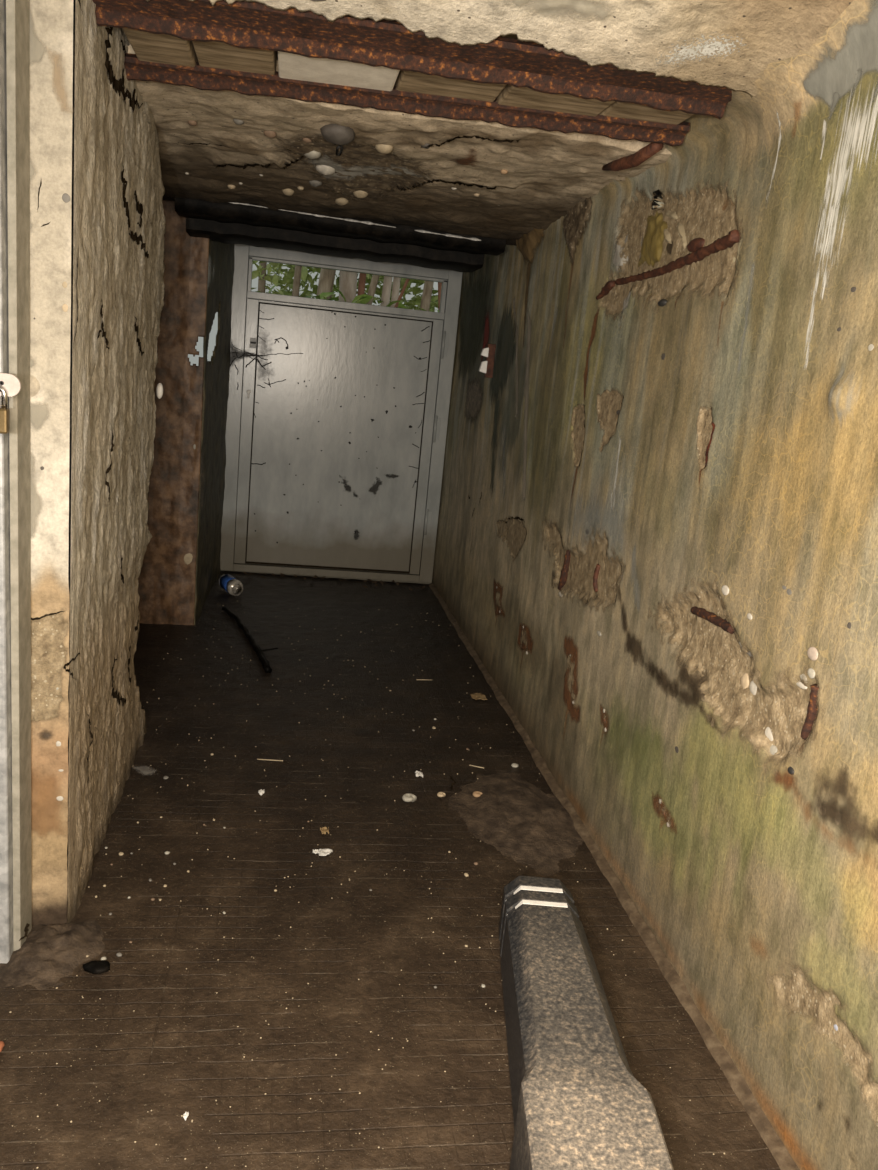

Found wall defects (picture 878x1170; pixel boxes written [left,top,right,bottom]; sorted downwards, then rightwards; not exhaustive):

crack [401,180,496,191]
crack [420,136,519,148]
spalling [596,183,741,320]
water stain [805,70,878,366]
spalling [696,407,715,482]
spalling [497,516,527,561]
spalling [542,518,624,612]
corrosion [564,637,580,721]
water stain [618,588,715,726]
spalling [648,581,819,788]
water stain [818,771,878,841]
spalling [767,966,878,1123]